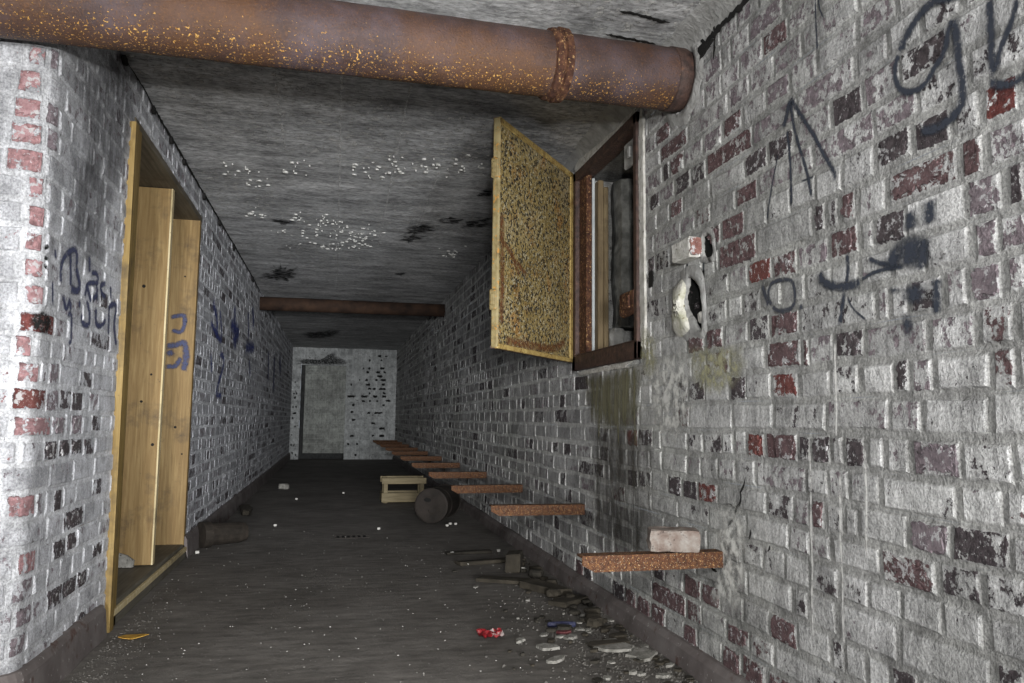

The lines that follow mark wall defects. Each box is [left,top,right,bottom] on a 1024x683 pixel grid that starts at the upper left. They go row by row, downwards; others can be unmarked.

rust [499,216,526,322]
spalling [681,227,722,351]
rust [507,337,564,352]